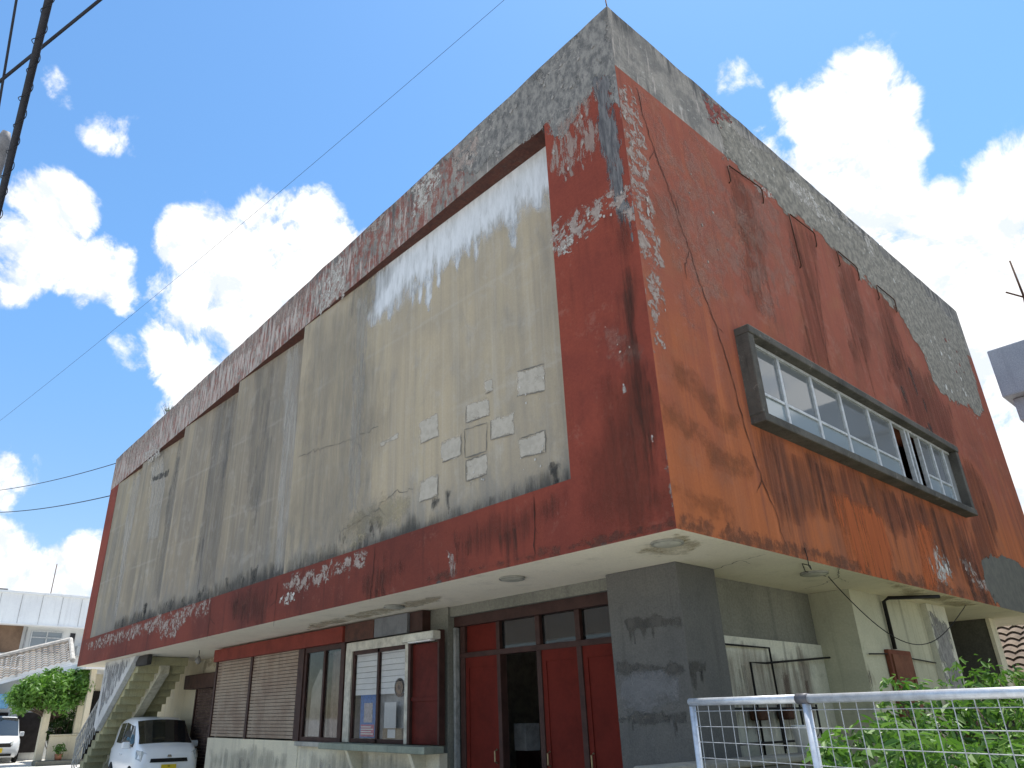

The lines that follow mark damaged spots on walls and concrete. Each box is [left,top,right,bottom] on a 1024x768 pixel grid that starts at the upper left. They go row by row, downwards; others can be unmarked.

flaking render [411,7,666,353]
peeling [220,330,263,366]
peeling [273,257,347,330]
leakage [411,269,441,309]
crack [637,89,786,544]
flaking render [706,99,984,416]
leakage [527,463,568,493]
rust [834,494,897,582]
leakage [115,550,337,630]
peeling [280,550,368,605]
leakage [624,613,681,644]
leakage [616,661,706,690]